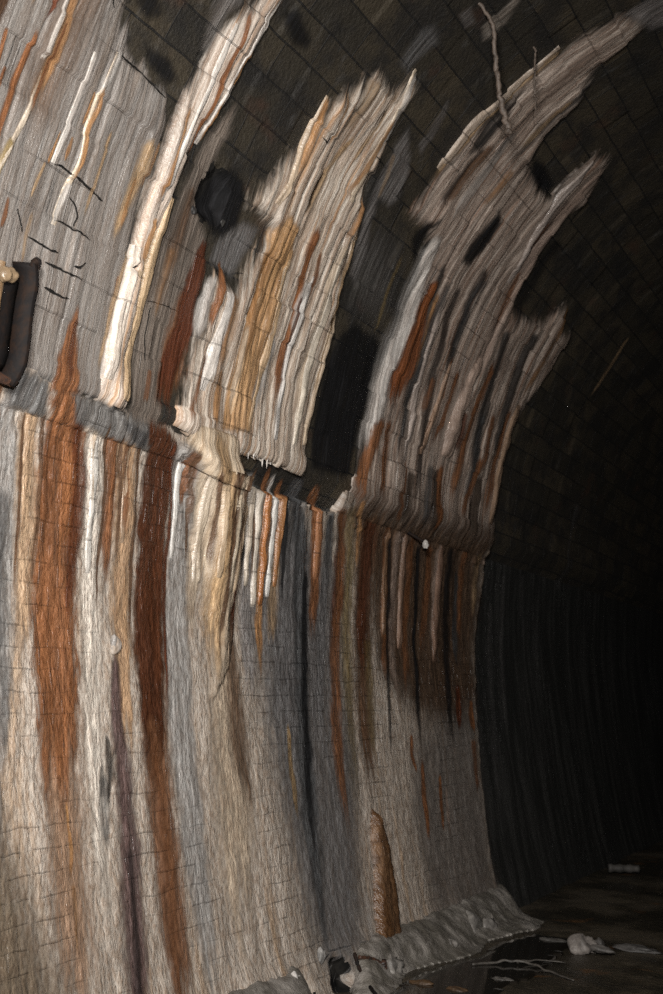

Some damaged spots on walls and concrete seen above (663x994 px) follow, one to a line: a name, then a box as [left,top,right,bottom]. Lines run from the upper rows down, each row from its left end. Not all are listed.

rust [30,309,89,994]